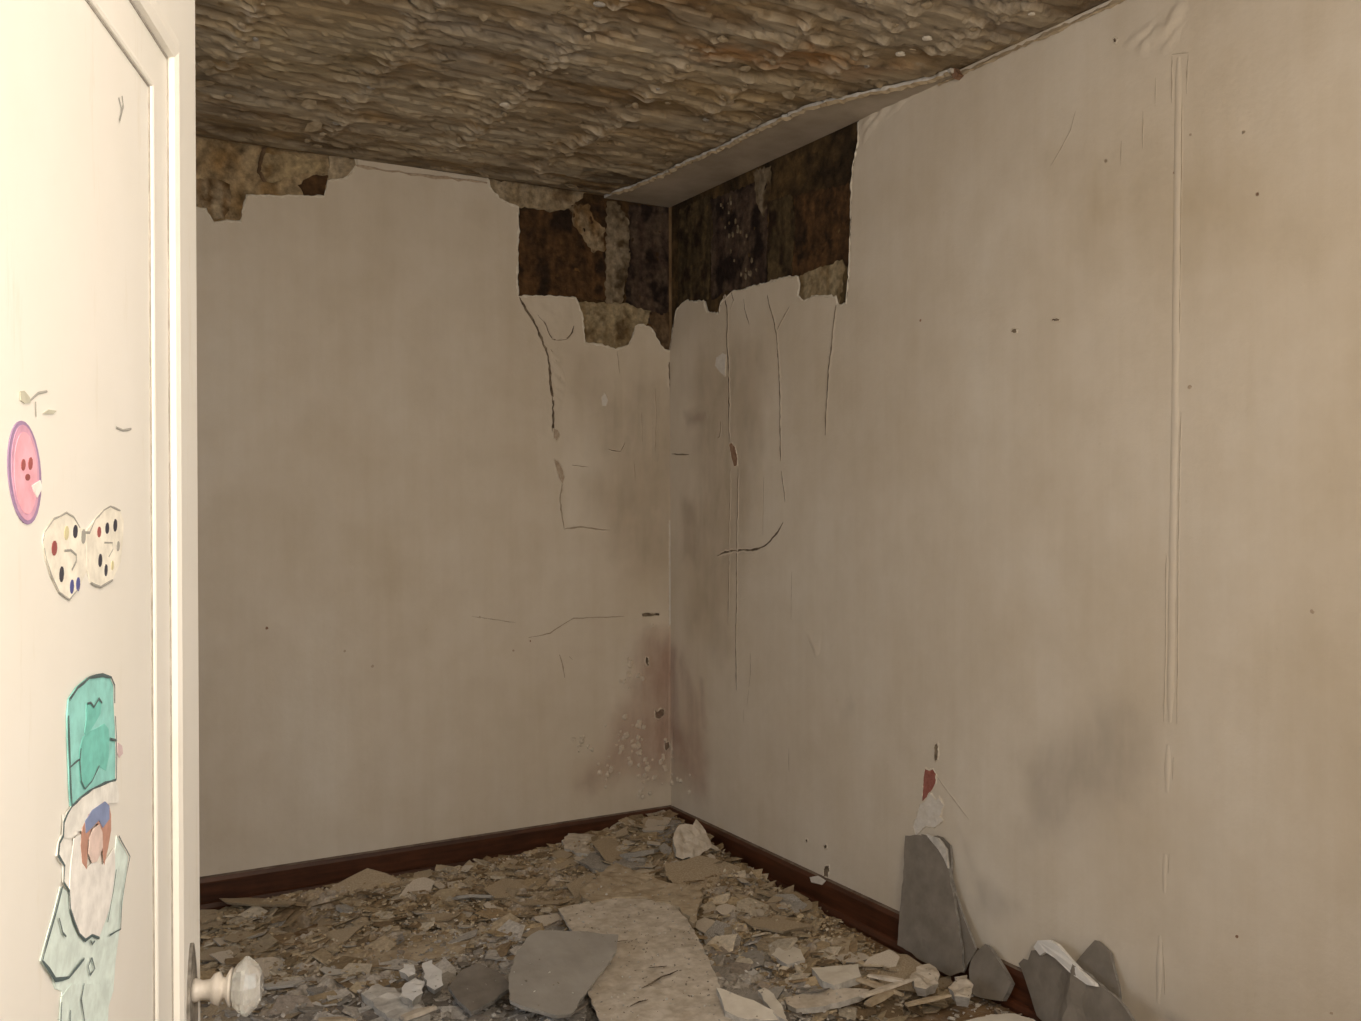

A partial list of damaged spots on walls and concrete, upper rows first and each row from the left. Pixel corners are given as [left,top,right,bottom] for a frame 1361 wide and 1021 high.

spalling [487,121,859,352]
crack [518,297,625,533]
crack [717,293,790,690]
crack [823,305,838,435]
crack [472,615,624,678]
peeling [913,767,945,835]